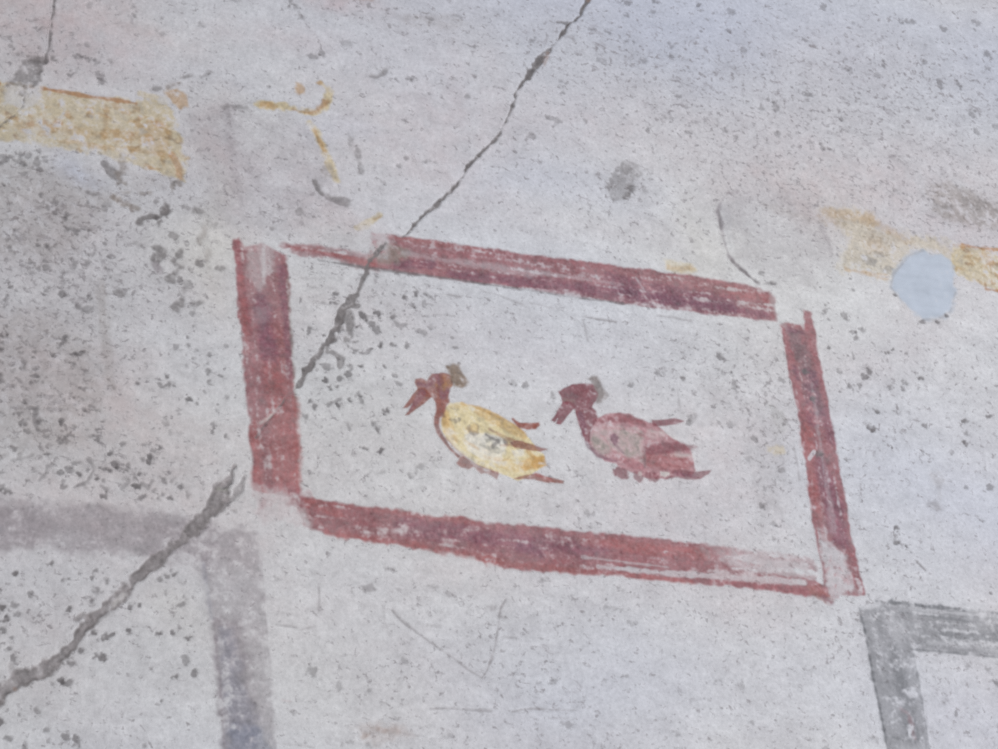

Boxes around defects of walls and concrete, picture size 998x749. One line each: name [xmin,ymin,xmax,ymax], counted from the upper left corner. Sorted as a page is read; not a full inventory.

crack [36,0,58,65]
crack [0,95,27,129]
crack [253,0,593,440]
spalling [916,312,951,326]
crack [0,462,247,712]